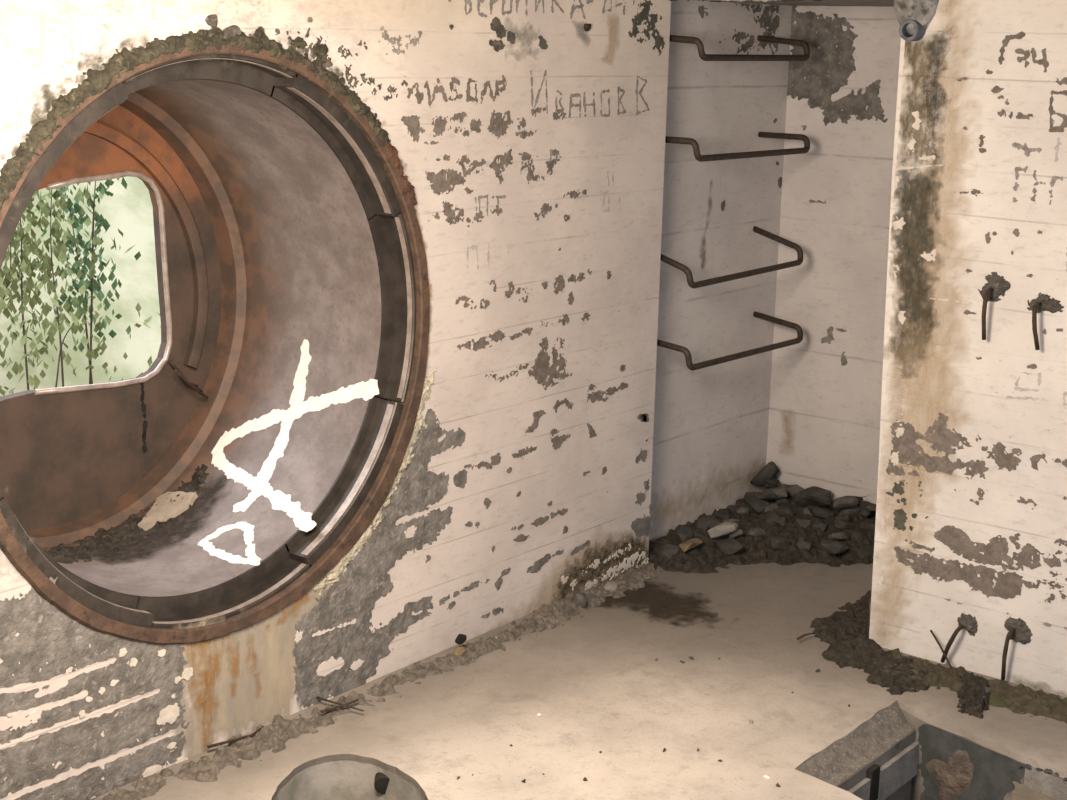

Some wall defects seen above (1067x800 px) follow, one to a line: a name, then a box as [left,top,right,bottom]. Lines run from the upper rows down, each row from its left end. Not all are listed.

peeling [401,103,566,145]
peeling [719,3,888,126]
peeling [425,149,561,227]
leakage [891,34,957,453]
peeling [455,269,592,390]
peeling [292,405,537,708]
leakage [551,536,649,601]
leakage [599,581,716,625]
peeling [881,412,1067,603]
peeling [0,586,193,800]
rust [177,577,329,758]
leakage [917,724,1025,800]